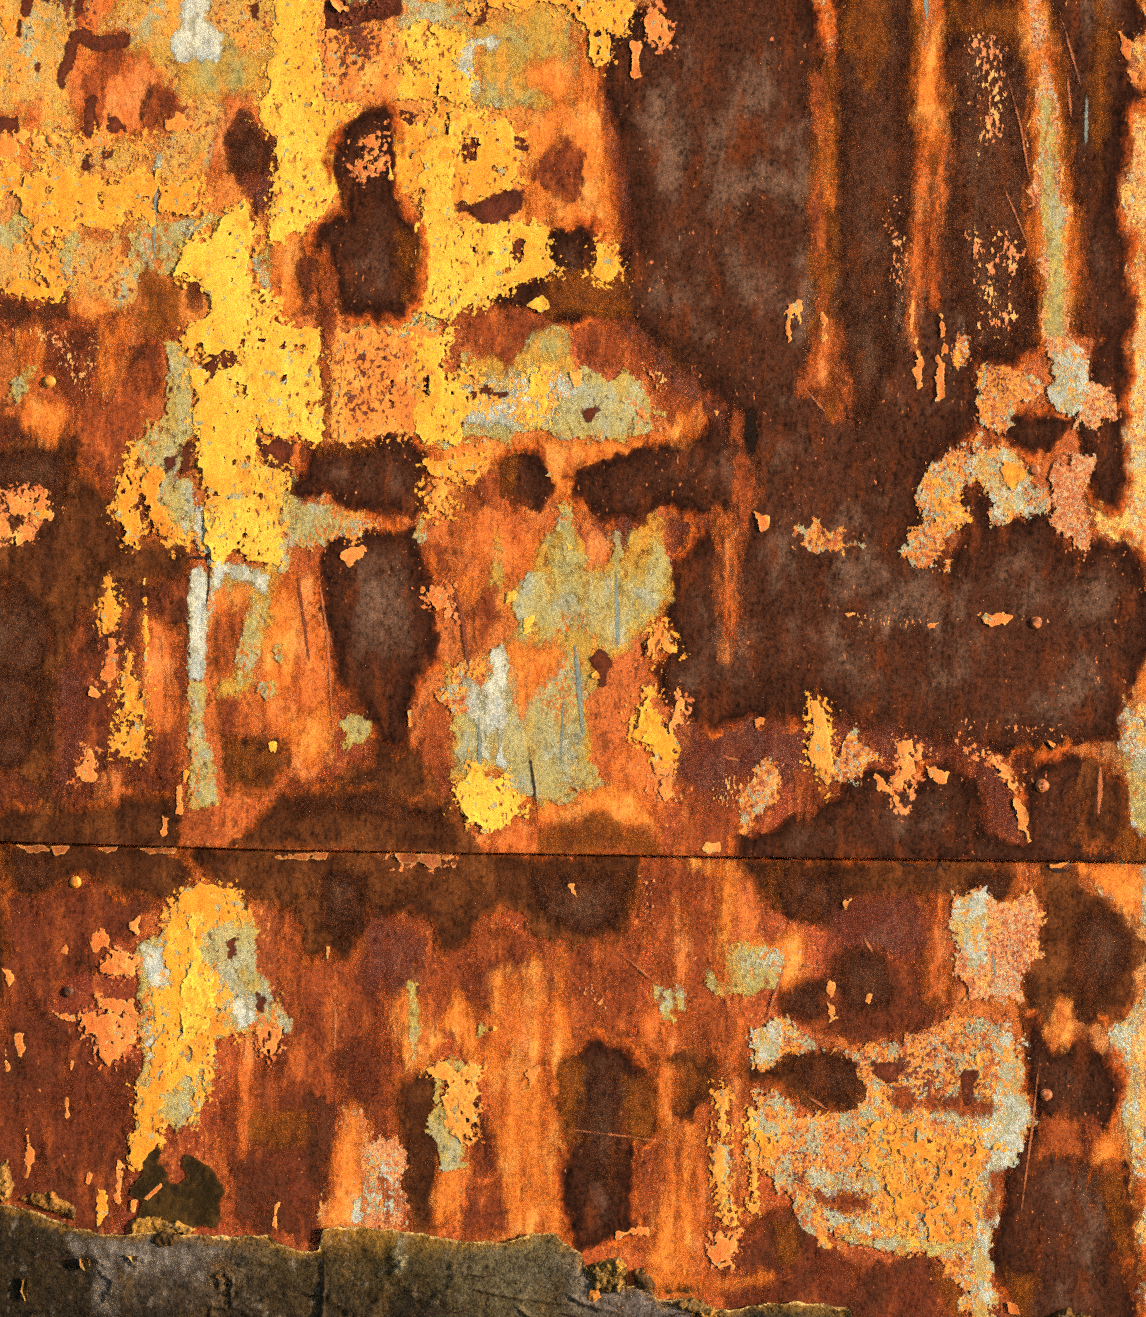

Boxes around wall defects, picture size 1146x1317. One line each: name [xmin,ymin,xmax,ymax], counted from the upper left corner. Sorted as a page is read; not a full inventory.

rust [205,350,238,379]
rust [201,94,280,218]
rust [249,3,259,20]
peeling [0,0,702,843]
peeling [898,0,1146,573]
rust [0,266,197,1233]
rust [256,0,1146,1317]
peeling [712,689,949,835]
leakage [66,1235,216,1317]
peeling [52,877,293,1248]
leakage [393,1237,409,1275]
peeling [696,885,1048,1317]